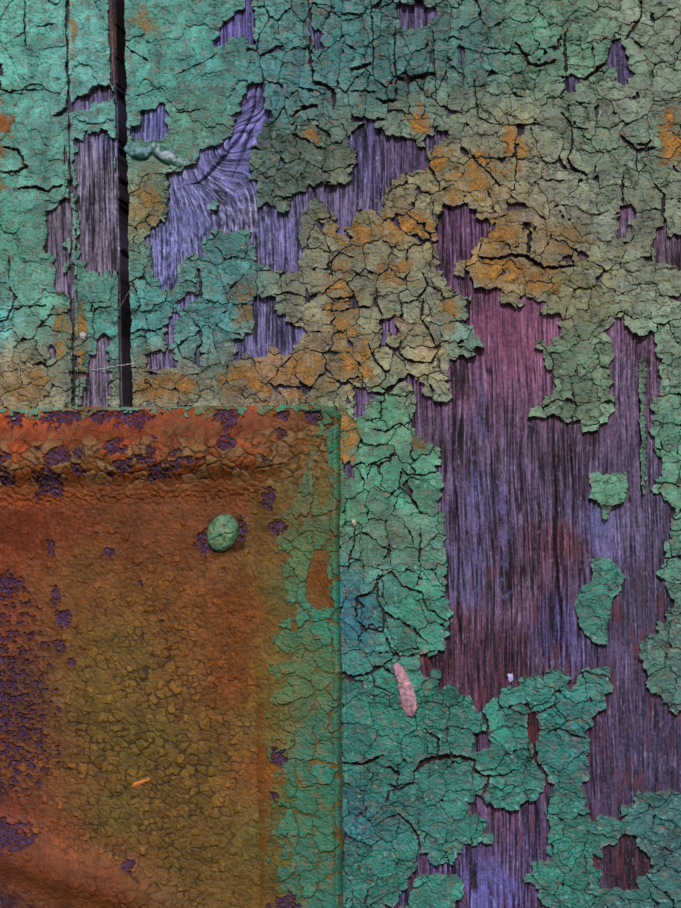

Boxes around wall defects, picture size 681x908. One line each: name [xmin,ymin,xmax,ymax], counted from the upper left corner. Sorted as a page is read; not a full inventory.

crack [294,0,437,117]
crack [4,147,63,193]
peeling [0,0,452,450]
crack [479,222,575,270]
crack [279,252,441,396]
peeling [0,442,86,501]
peeling [103,436,205,484]
peeling [249,0,681,908]
crack [344,433,513,694]
peeling [0,569,77,803]
peeling [0,817,43,856]
crack [375,701,581,849]